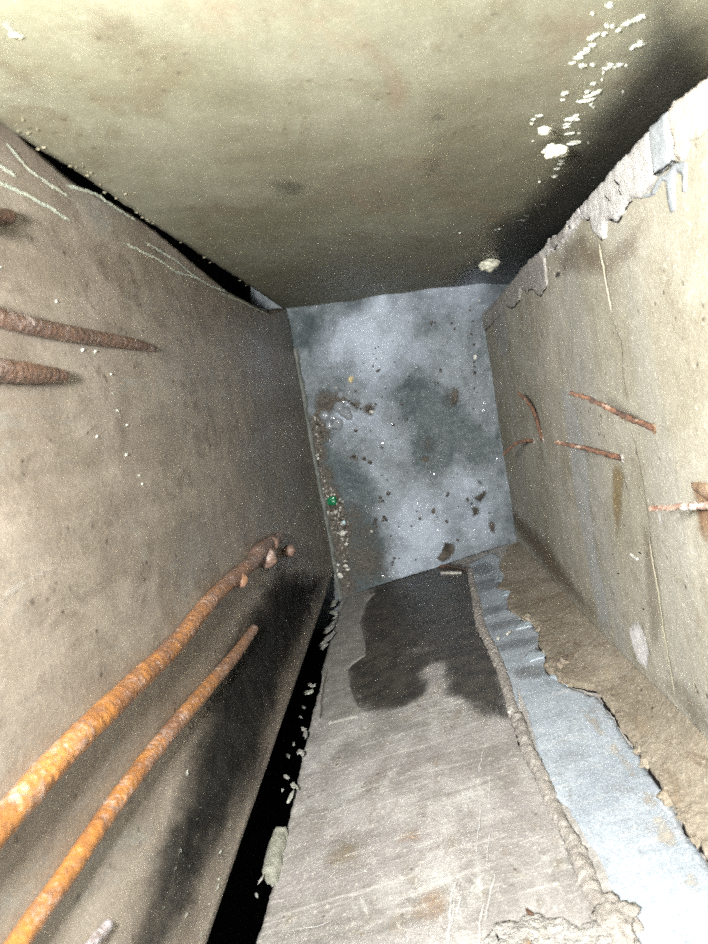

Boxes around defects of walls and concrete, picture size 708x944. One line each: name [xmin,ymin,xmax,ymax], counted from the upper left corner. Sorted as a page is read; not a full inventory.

spalling [549,79,708,248]
rust [0,208,17,225]
spalling [482,251,548,330]
rust [0,307,157,352]
rust [0,358,69,384]
rust [696,492,708,536]
damp [349,565,508,717]
peeling [515,621,532,630]
peeling [525,651,546,662]
rust [0,532,295,849]
rust [3,625,259,944]
spalling [483,912,612,944]